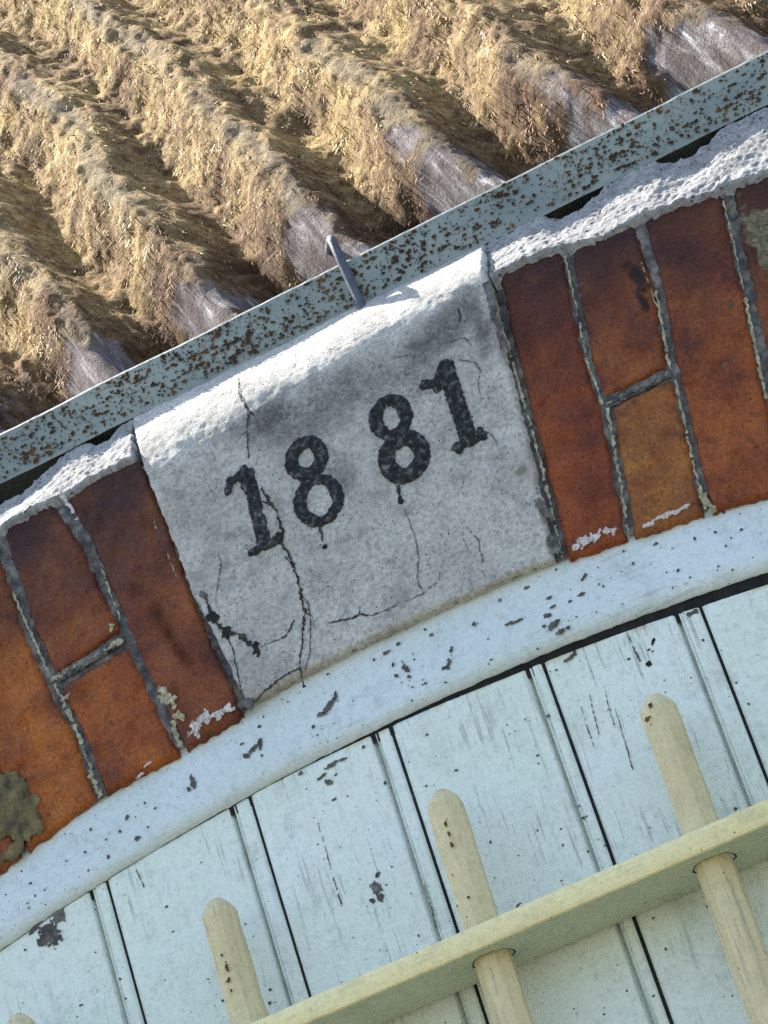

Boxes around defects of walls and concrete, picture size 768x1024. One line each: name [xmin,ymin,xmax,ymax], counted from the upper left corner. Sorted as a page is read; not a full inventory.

corrosion [0,53,768,478]
leakage [478,281,508,354]
crack [238,378,254,458]
leakage [534,498,555,521]
efflorescence [642,504,690,528]
leakage [546,527,616,558]
crack [187,487,485,713]
peeling [542,595,570,635]
peeling [373,650,411,679]
leakage [188,703,236,739]
peeling [29,907,66,947]